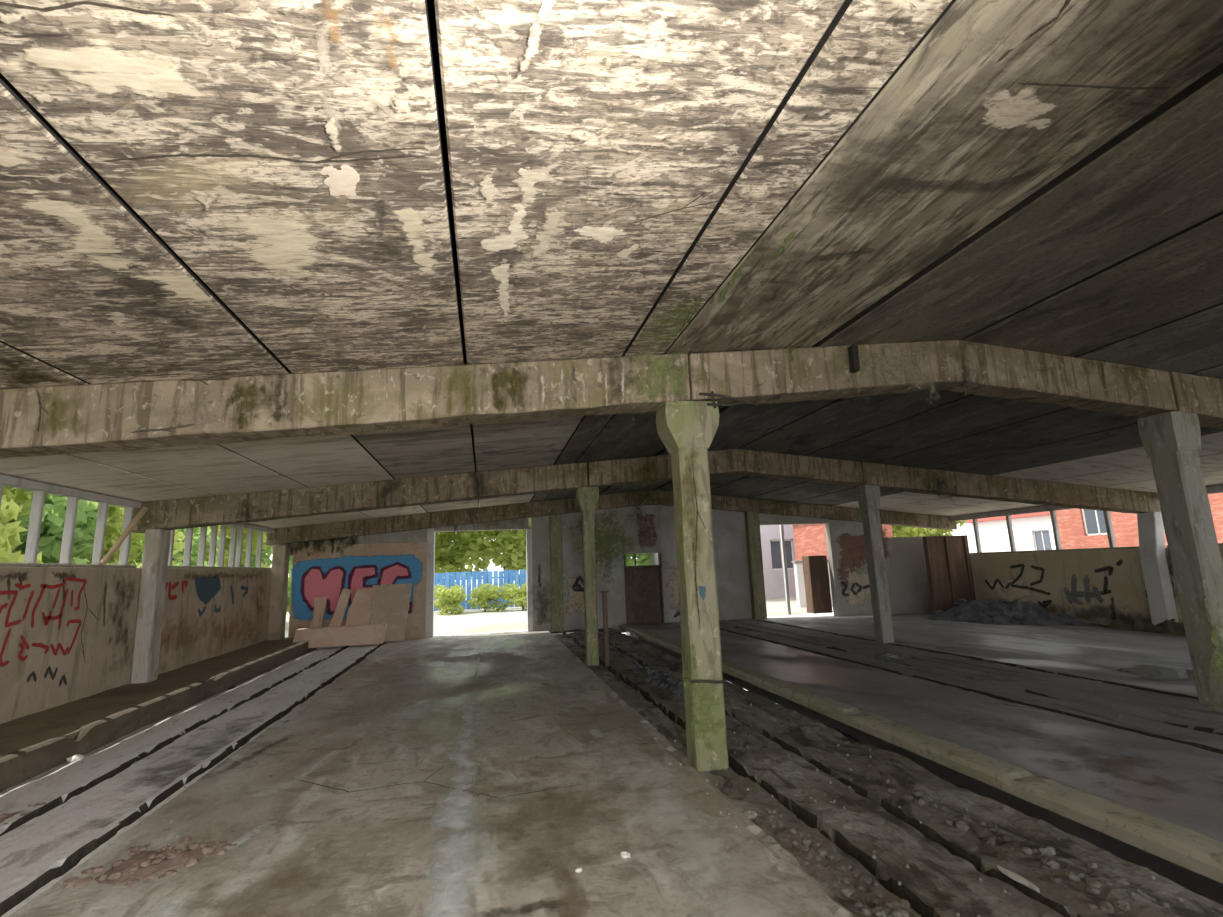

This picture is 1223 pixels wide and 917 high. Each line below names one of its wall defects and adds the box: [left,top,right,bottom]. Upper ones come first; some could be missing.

peeling [518,0,556,78]
peeling [961,0,1064,53]
damp [778,113,831,138]
peeling [982,86,1056,130]
peeling [319,118,360,197]
damp [834,138,1038,211]
peeling [479,168,639,322]
damp [493,369,518,408]
damp [605,355,632,402]